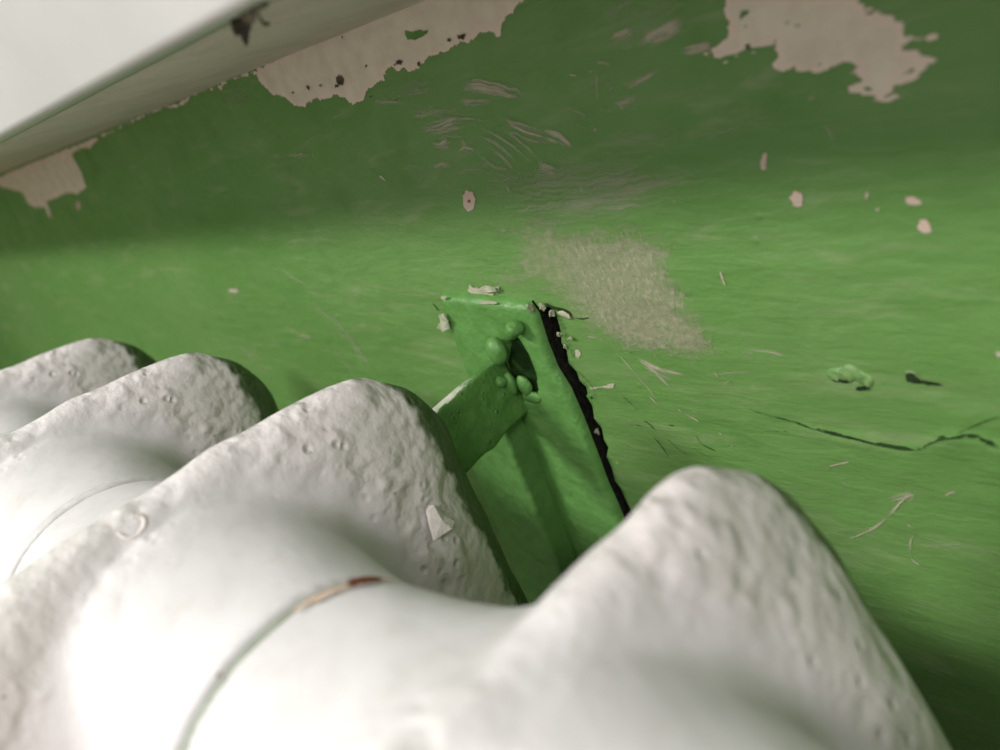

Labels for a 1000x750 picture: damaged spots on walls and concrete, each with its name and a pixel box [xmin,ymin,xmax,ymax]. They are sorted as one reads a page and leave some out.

peeling [704,0,938,102]
peeling [0,0,524,218]
peeling [789,191,803,207]
peeling [906,197,922,205]
crack [526,302,588,349]
crack [750,409,995,451]